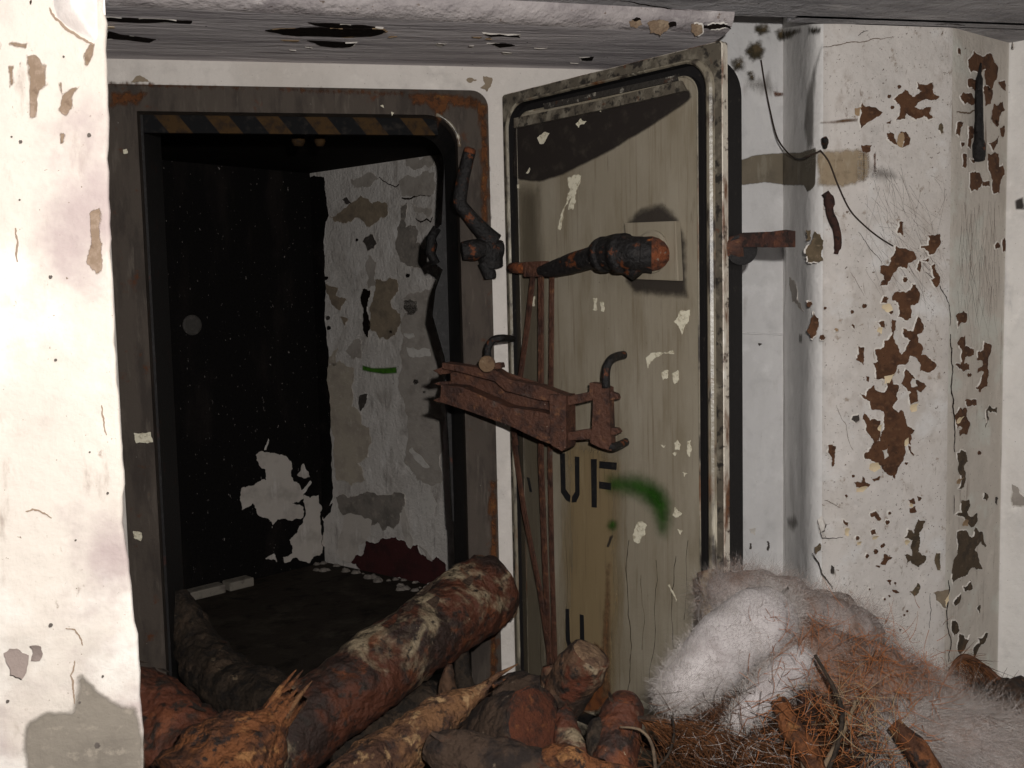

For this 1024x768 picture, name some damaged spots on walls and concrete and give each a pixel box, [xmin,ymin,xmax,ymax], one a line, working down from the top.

peeling [10,42,46,118]
peeling [59,83,77,115]
spalling [106,16,192,43]
spalling [265,22,397,51]
rust [379,92,490,222]
peeling [836,47,1006,195]
peeling [86,208,103,274]
peeling [239,155,446,584]
peeling [789,220,941,499]
peeling [955,311,997,436]
peeling [903,449,1024,656]
peeling [4,645,43,679]